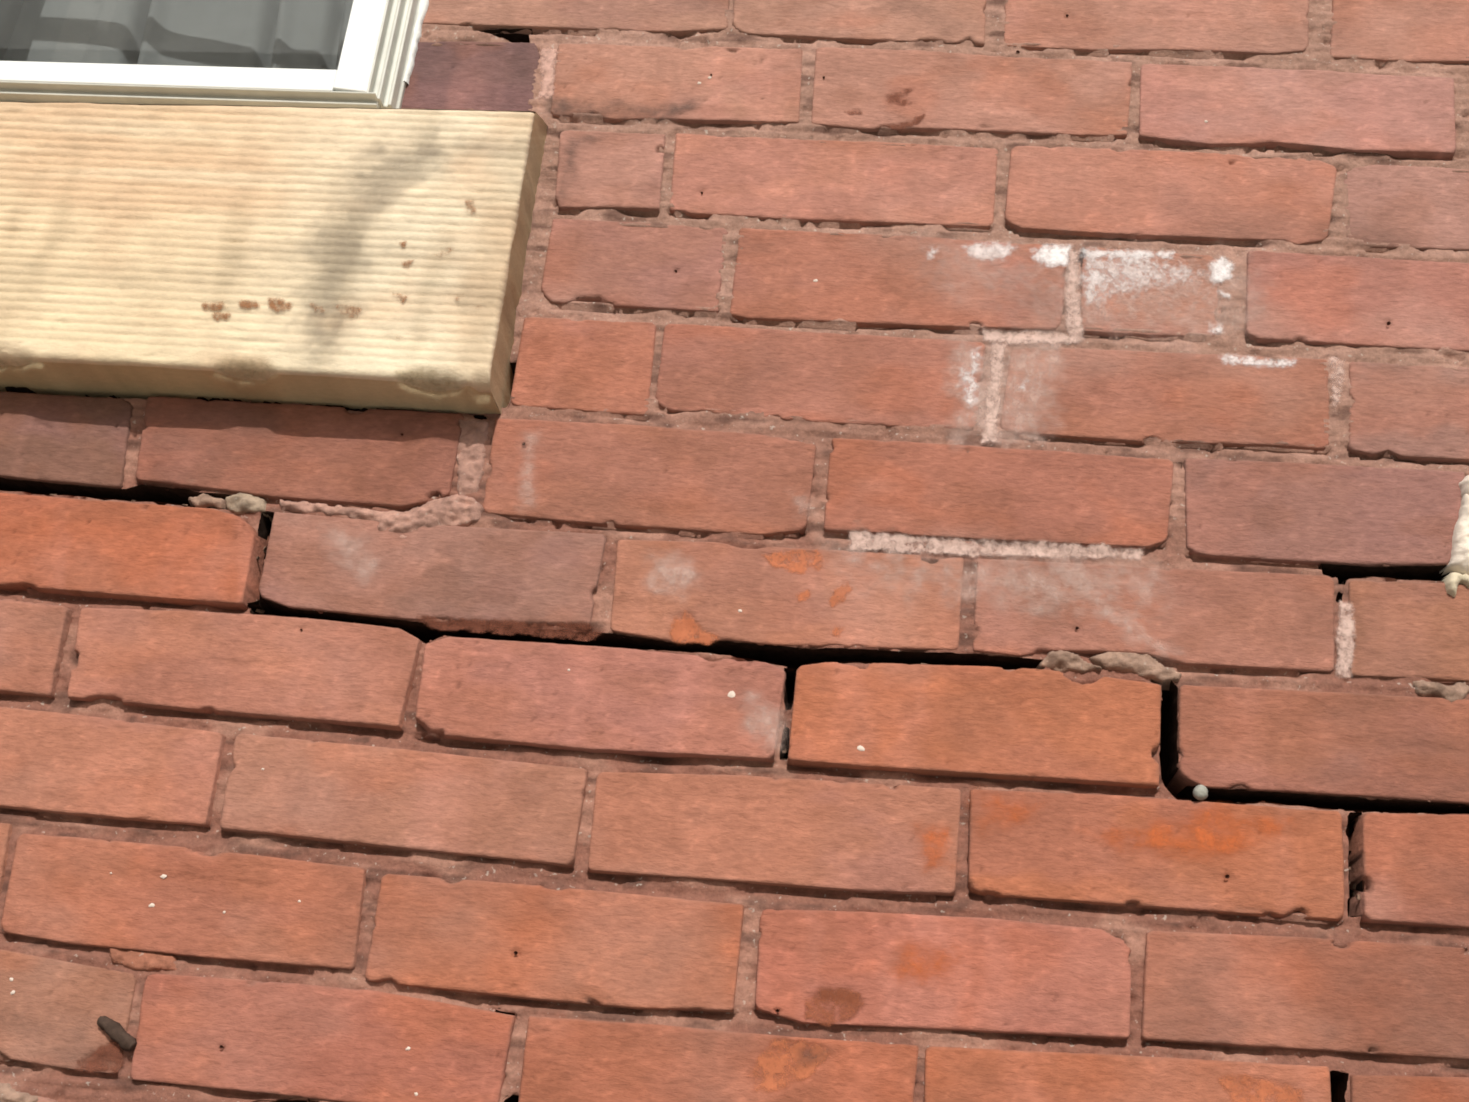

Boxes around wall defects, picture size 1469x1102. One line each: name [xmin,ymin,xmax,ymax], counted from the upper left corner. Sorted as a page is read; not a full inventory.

damp [1211,257,1233,296]
damp [965,244,1189,443]
damp [1223,356,1294,365]
crack [5,386,37,394]
crack [196,397,487,420]
crack [1318,564,1450,603]
crack [0,478,1042,760]
crack [1148,680,1469,917]